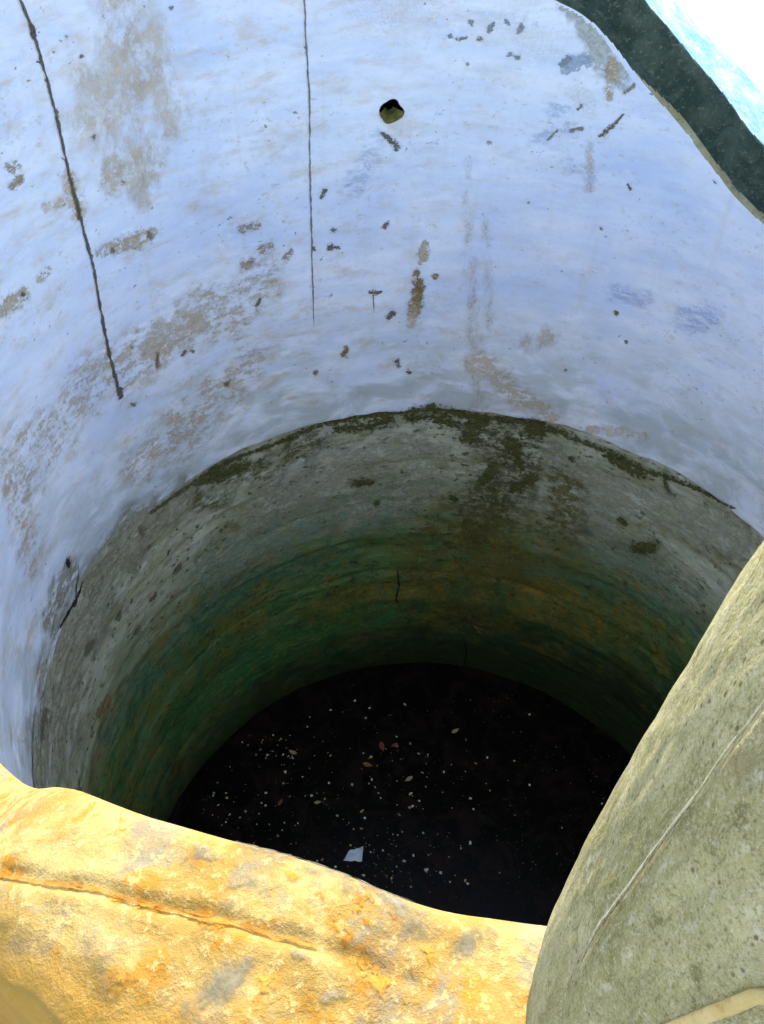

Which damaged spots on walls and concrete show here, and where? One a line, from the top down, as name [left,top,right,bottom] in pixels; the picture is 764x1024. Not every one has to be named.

crack [19,0,124,400]
crack [303,0,316,321]
damp [542,449,750,558]